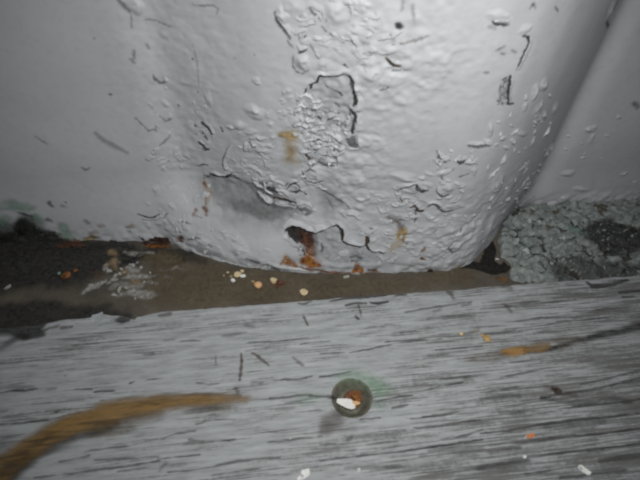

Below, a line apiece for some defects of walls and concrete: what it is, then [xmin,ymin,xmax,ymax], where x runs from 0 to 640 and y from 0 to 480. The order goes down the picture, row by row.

peeling [497,74,515,105]
peeling [198,119,223,151]
peeling [257,64,386,263]
damp [0,212,206,288]
rust [281,246,378,275]
damp [0,302,129,328]